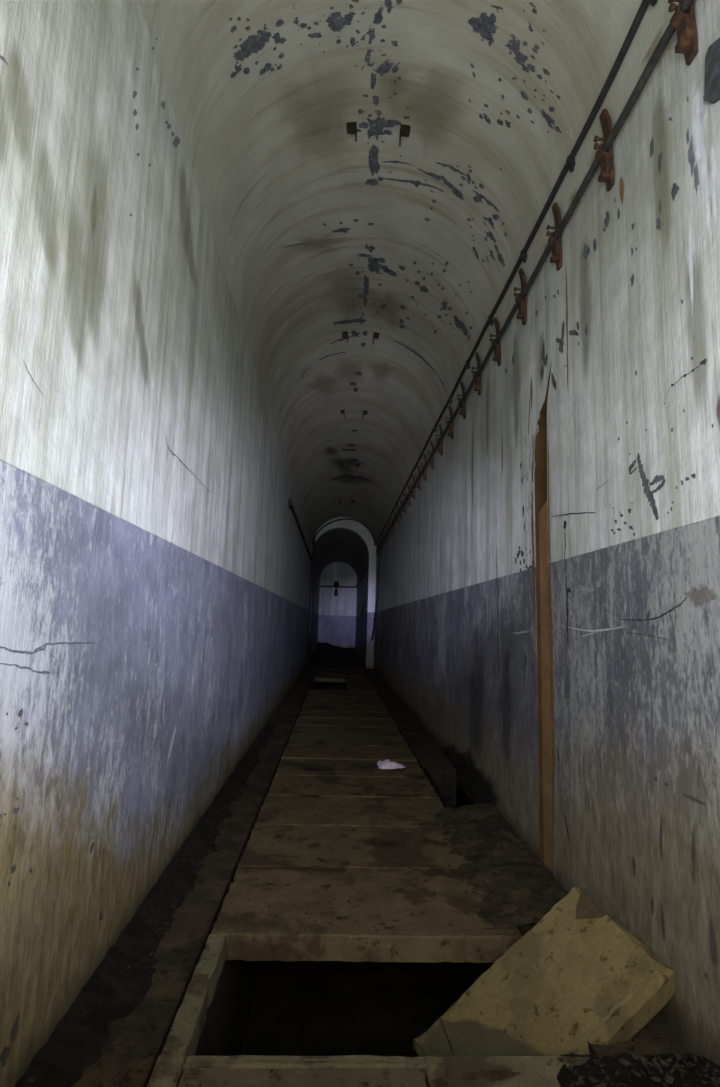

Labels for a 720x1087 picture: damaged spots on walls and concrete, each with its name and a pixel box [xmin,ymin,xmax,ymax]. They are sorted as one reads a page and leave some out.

peeling [468,2,561,133]
peeling [229,0,507,267]
peeling [318,244,473,361]
crack [0,642,93,674]